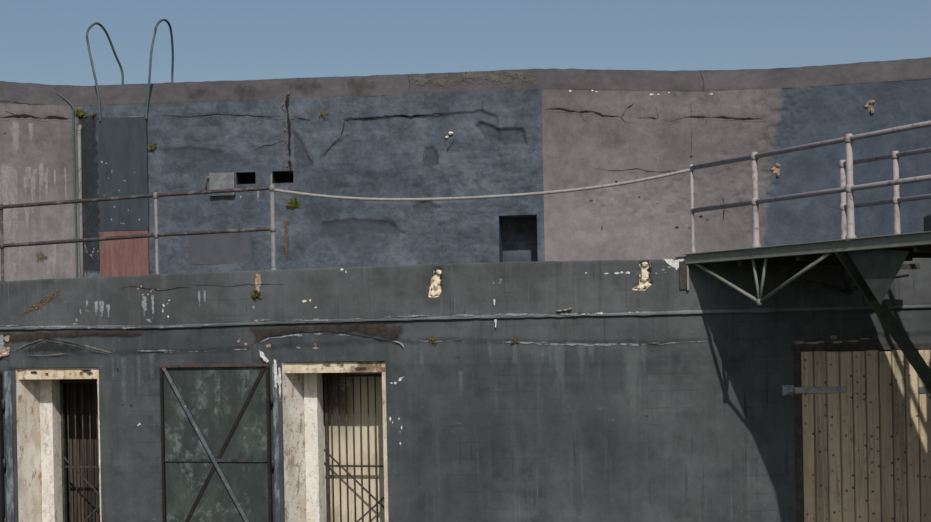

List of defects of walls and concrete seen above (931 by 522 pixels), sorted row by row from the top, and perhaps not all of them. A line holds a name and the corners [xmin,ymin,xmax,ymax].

damp [11,122,33,153]
crack [0,100,72,122]
crack [164,91,459,174]
crack [545,103,764,150]
damp [0,163,67,279]
spalling [428,269,442,297]
spalling [603,259,684,290]
peeling [0,325,27,357]